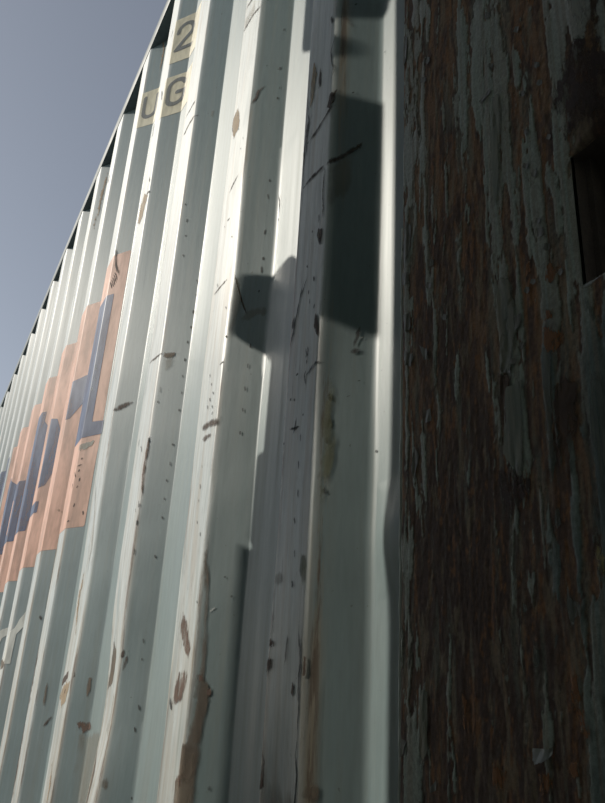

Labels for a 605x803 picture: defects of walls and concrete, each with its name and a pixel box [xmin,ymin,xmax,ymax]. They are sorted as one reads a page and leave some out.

corrosion [180,616,190,655]
corrosion [170,672,187,710]
corrosion [173,639,211,803]